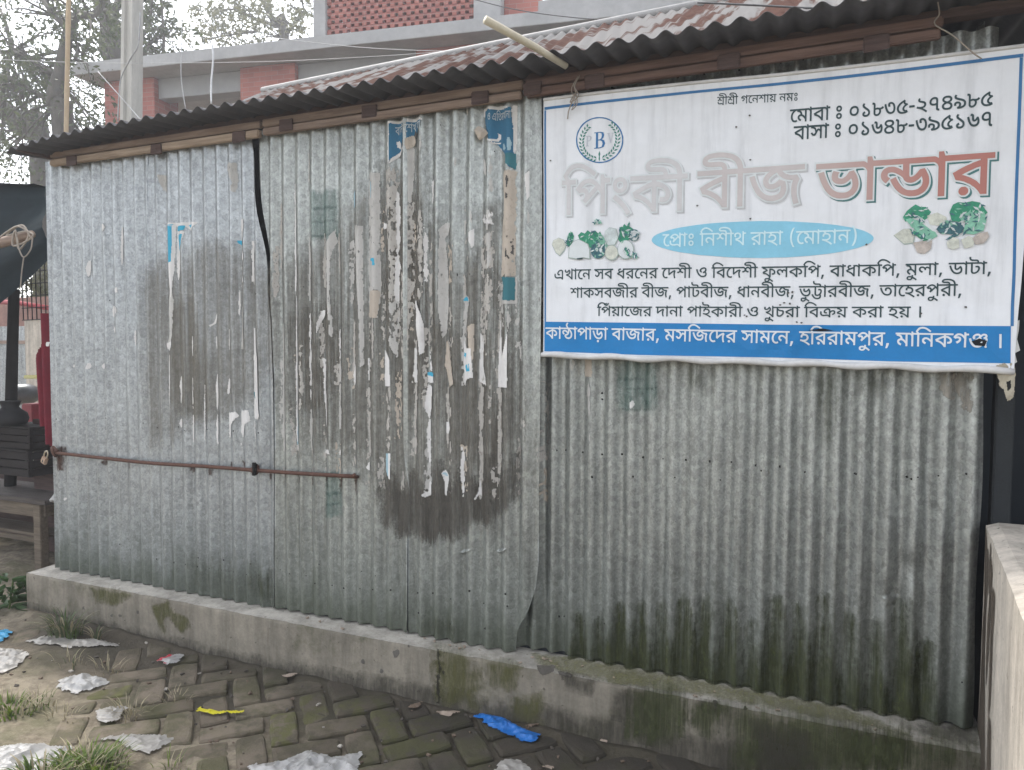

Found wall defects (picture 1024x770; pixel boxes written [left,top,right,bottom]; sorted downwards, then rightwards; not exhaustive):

leakage [387,196,427,388]
leakage [299,314,340,403]
leakage [450,327,502,458]
corrosion [56,446,66,470]
leakage [420,490,450,539]
leakage [92,588,127,605]
leakage [337,530,995,770]